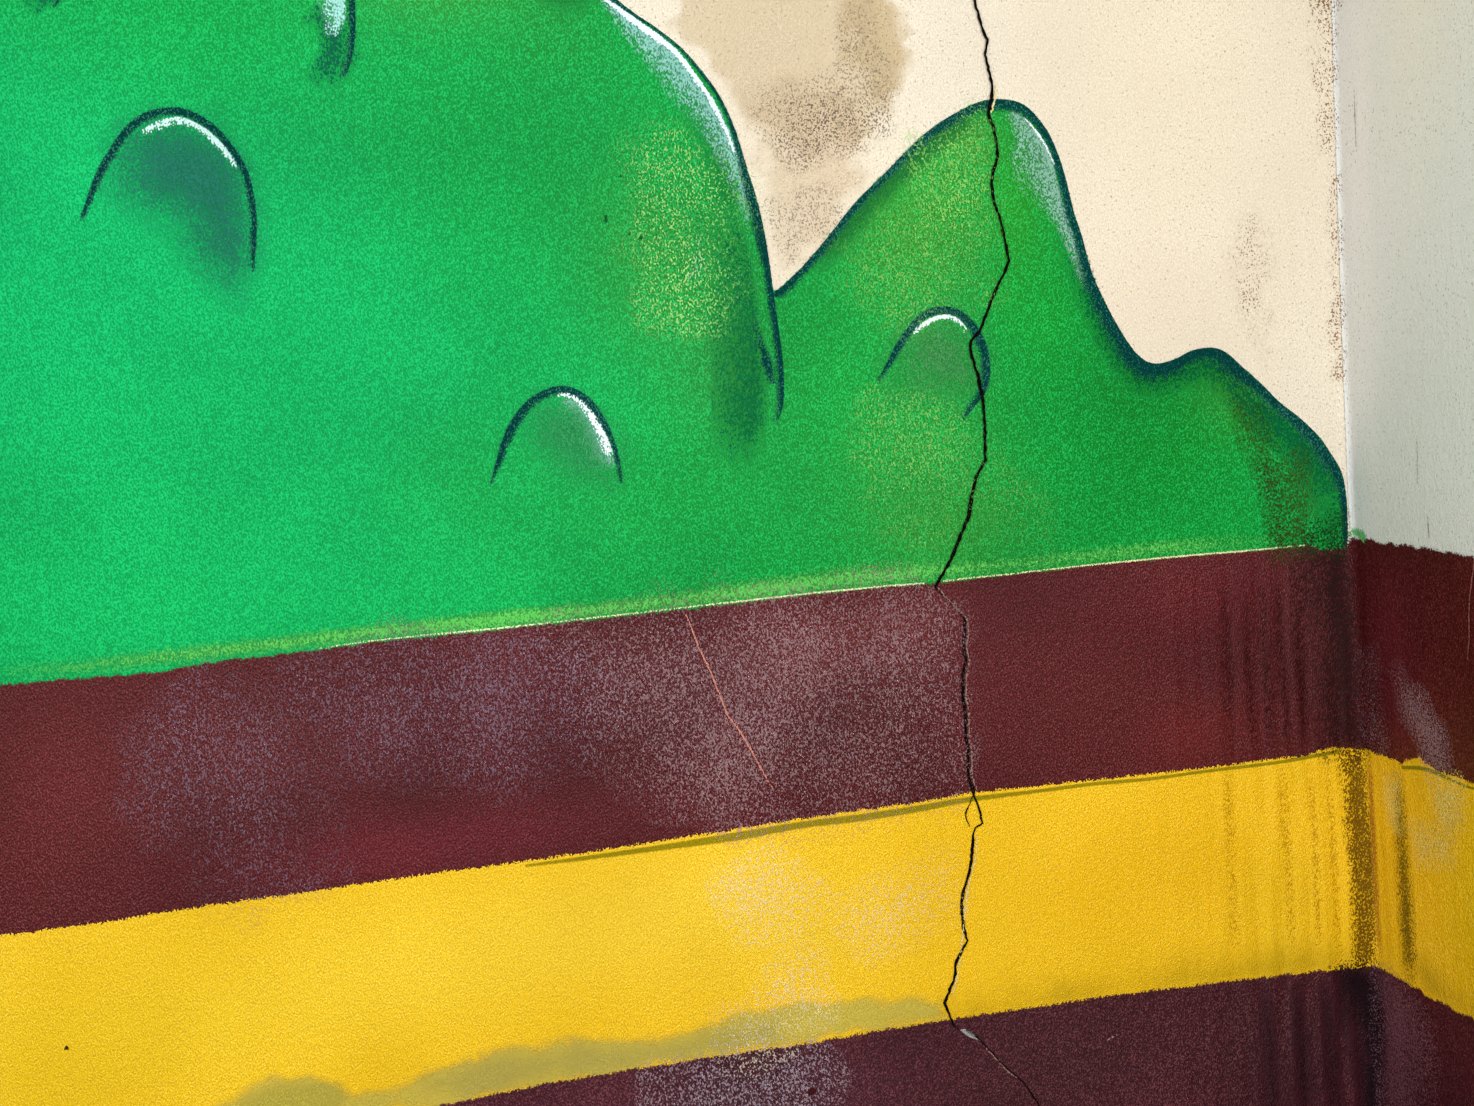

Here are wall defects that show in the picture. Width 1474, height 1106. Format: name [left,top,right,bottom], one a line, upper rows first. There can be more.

crack [934,0,1040,1106]
crack [1466,563,1474,660]